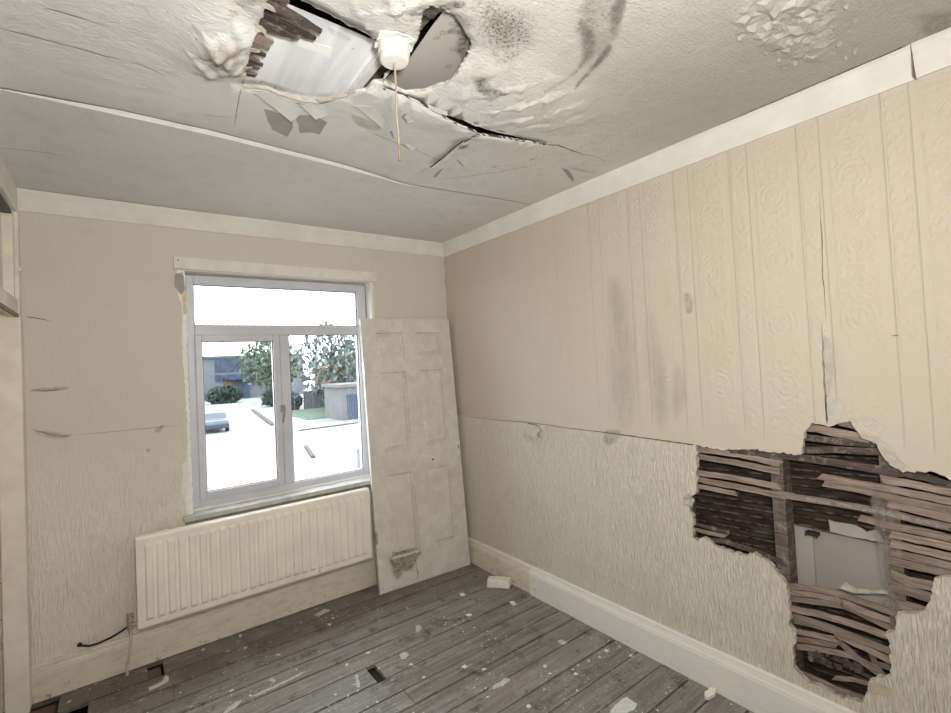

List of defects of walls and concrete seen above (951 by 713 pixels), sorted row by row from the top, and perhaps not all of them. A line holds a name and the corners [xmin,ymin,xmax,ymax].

leakage [612,0,624,24]
flaking render [725,0,859,71]
crack [1,87,591,203]
spalling [682,417,951,702]